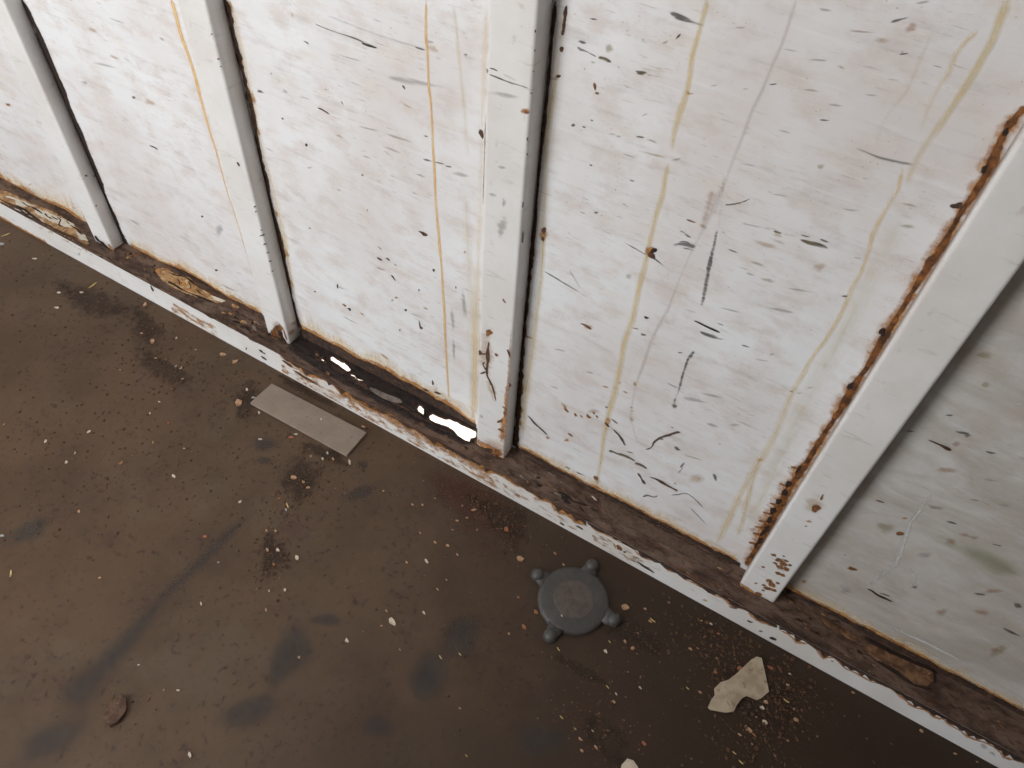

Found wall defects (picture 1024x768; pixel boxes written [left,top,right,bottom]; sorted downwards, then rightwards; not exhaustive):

peeling [0,190,89,245]
peeling [126,252,268,360]
peeling [343,380,403,403]
corrosion [224,0,1024,763]
peeling [857,637,937,690]